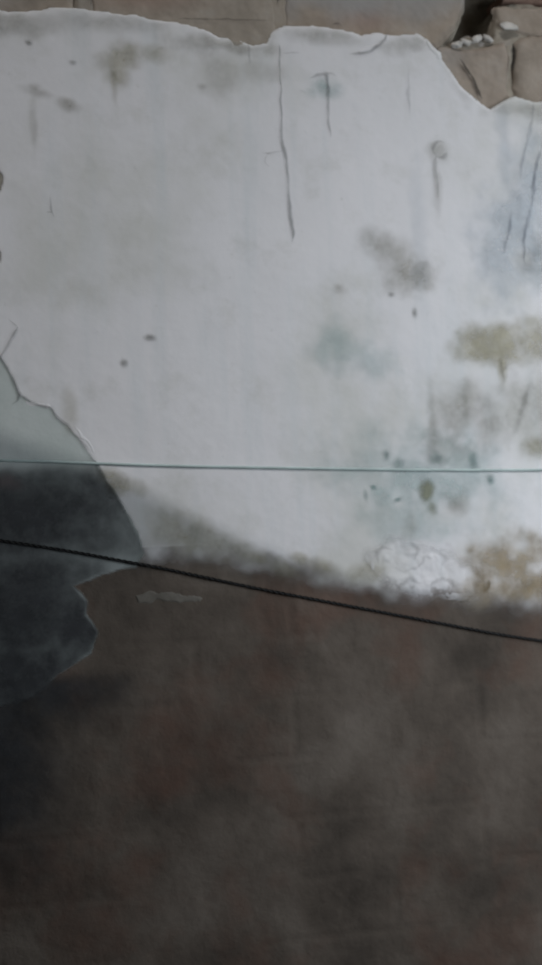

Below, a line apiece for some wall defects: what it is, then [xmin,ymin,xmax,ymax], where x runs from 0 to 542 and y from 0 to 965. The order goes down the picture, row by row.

flaking render [0,0,542,109]
flaking render [0,358,542,965]